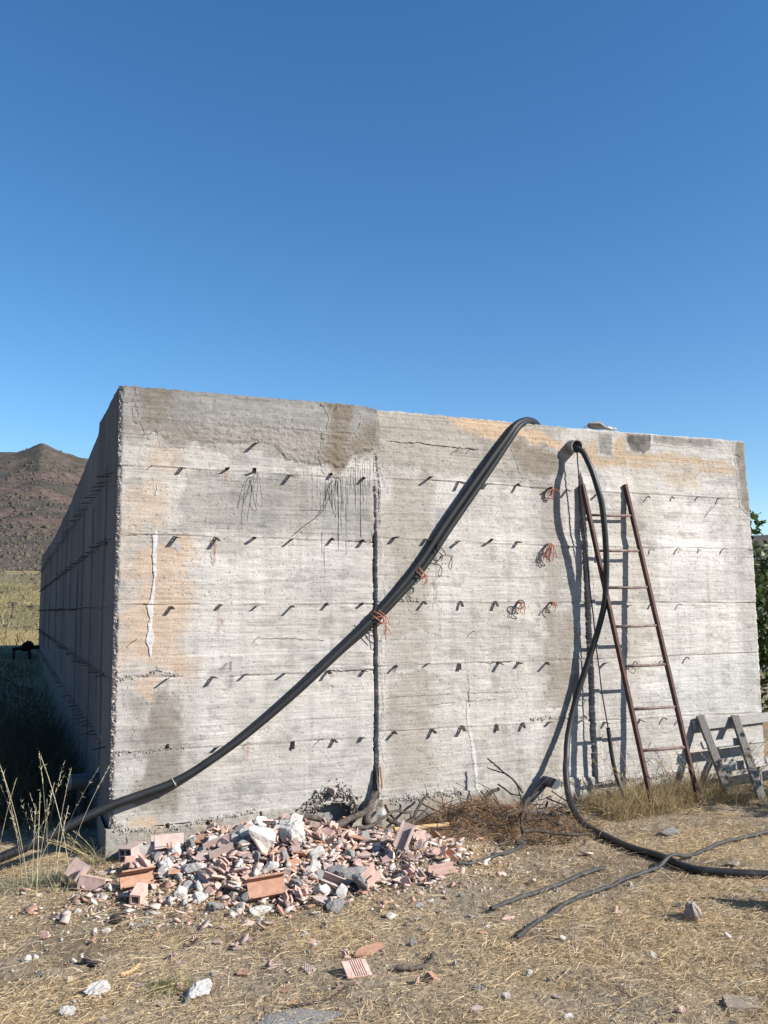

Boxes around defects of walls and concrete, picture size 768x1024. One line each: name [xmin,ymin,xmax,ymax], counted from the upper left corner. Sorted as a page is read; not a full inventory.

damp [43,386,217,836]
damp [308,402,447,819]